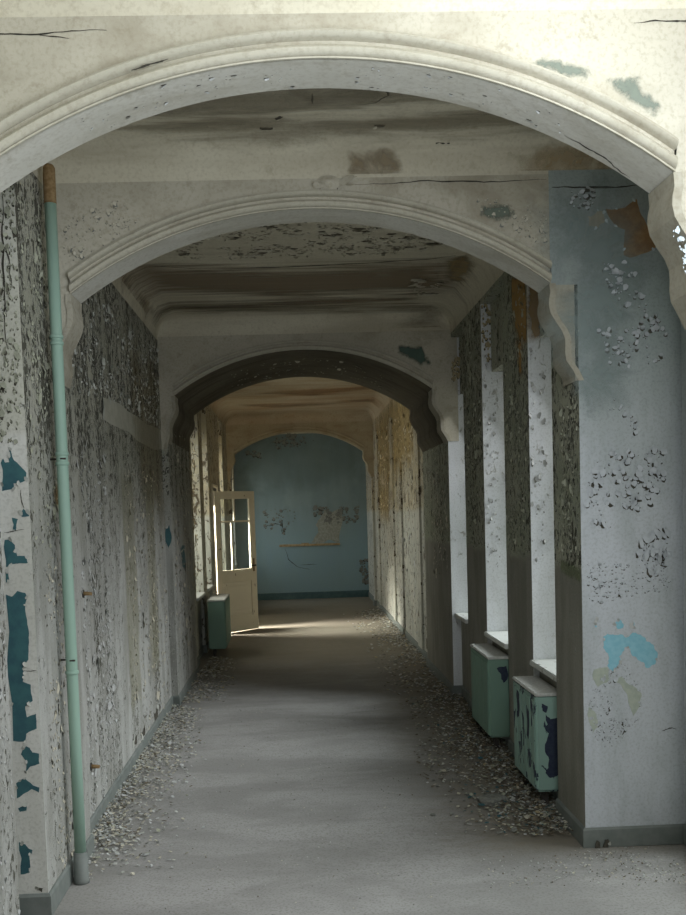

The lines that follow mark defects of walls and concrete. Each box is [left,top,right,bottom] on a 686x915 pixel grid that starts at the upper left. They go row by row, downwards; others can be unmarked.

crack [0,29,107,39]
damp [351,151,399,174]
flaking render [173,222,448,260]
flaking render [597,198,668,369]
peeling [673,226,686,274]
peeling [451,283,547,567]
peeling [559,382,668,561]
peeling [0,181,75,872]
peeling [587,527,672,604]
peeling [587,619,658,747]
peeling [0,841,36,889]